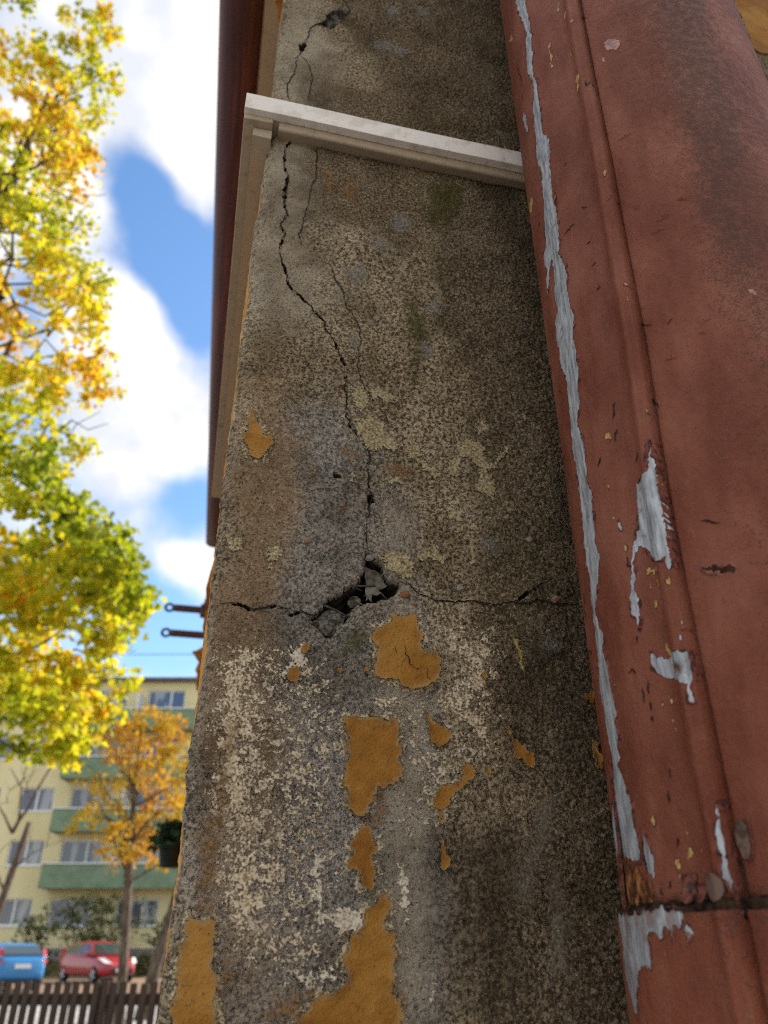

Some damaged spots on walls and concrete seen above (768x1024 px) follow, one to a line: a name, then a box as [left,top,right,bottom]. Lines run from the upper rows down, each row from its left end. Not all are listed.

crack [284,0,351,101]
crack [279,143,405,551]
peeling [507,0,744,1021]
peeling [192,565,213,691]
crack [220,602,328,642]
peeling [284,642,311,682]
peeling [312,560,448,697]
crack [400,572,592,665]
peeling [425,711,452,748]
peeling [290,708,408,1024]
peeling [423,753,492,872]
peeling [166,907,228,1024]